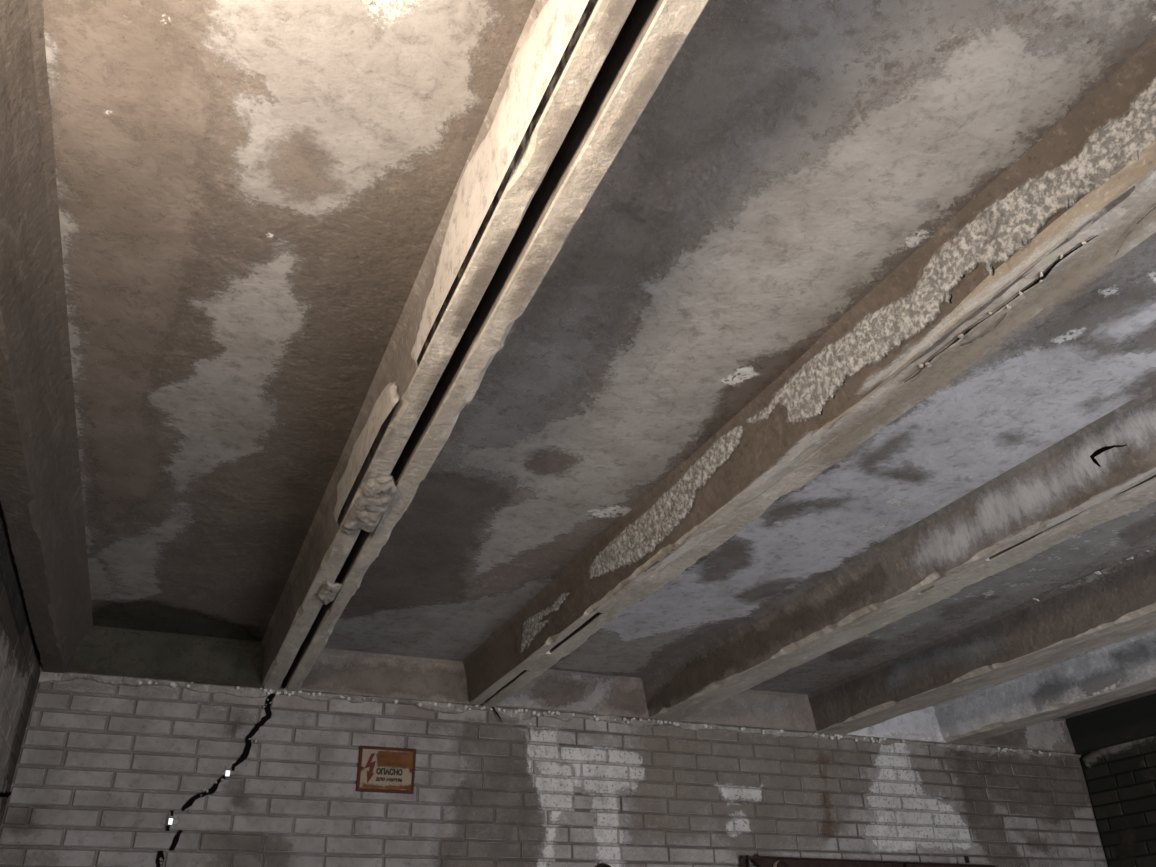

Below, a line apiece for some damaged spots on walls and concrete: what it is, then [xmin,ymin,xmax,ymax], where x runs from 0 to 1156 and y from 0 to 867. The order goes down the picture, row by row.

peeling [202,0,501,220]
leakage [547,107,580,159]
leakage [44,0,214,533]
leakage [453,239,504,330]
peeling [439,0,1156,578]
leakage [860,213,1097,392]
crack [0,501,41,660]
leakage [344,473,511,618]
peeling [554,242,1156,694]
crack [1090,444,1127,467]
crack [155,686,282,867]
leakage [260,564,886,867]